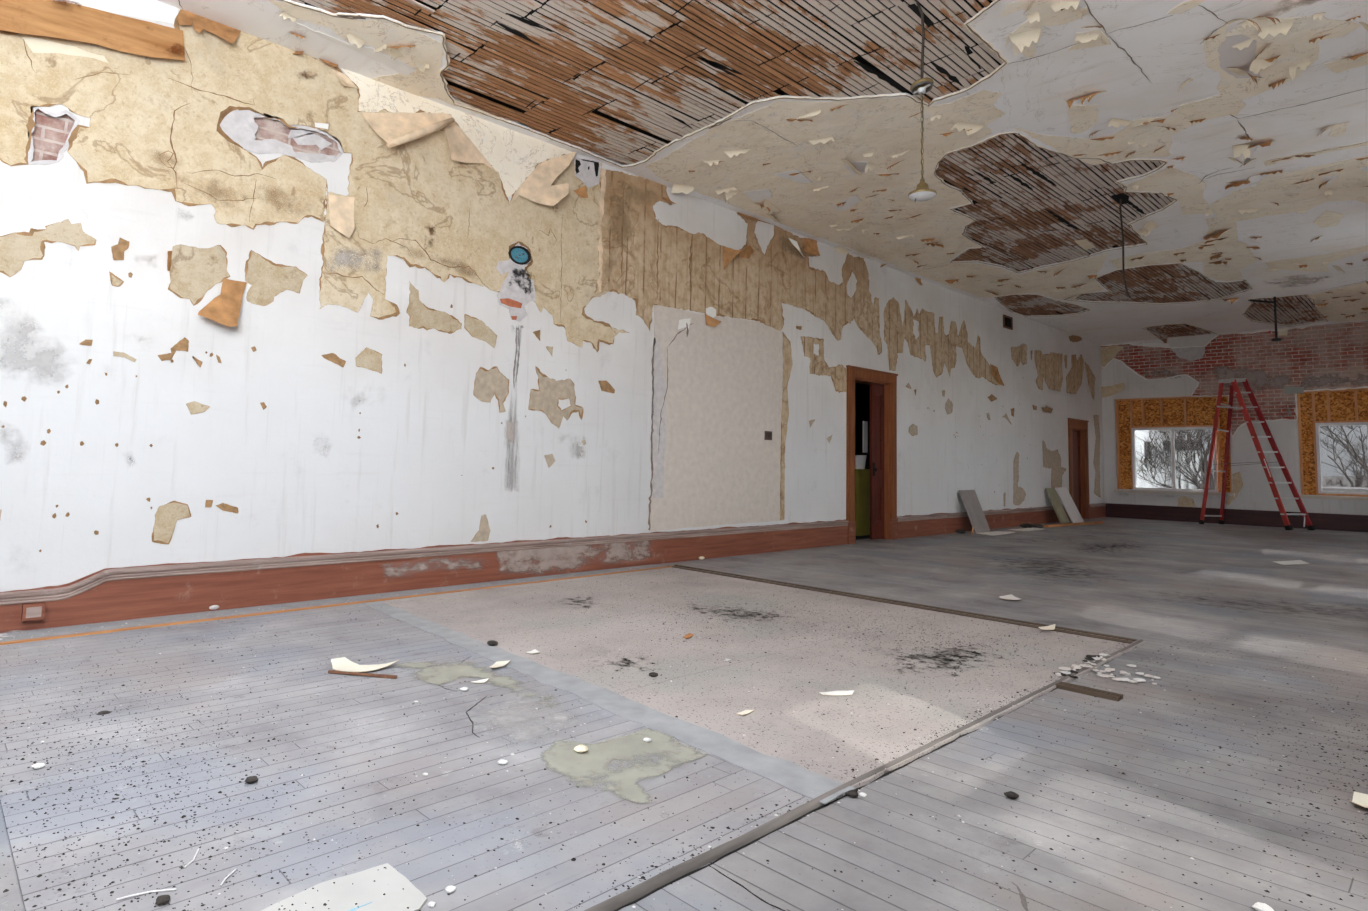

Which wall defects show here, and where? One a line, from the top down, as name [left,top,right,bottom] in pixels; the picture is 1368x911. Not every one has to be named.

peeling [0,0,241,63]
flaking render [28,106,80,165]
flaking render [216,106,343,163]
peeling [0,219,133,287]
peeling [268,0,1368,507]
peeling [167,244,308,327]
peeling [386,559,480,576]
peeling [471,514,650,573]
water stain [396,661,705,803]
crack [710,866,790,911]